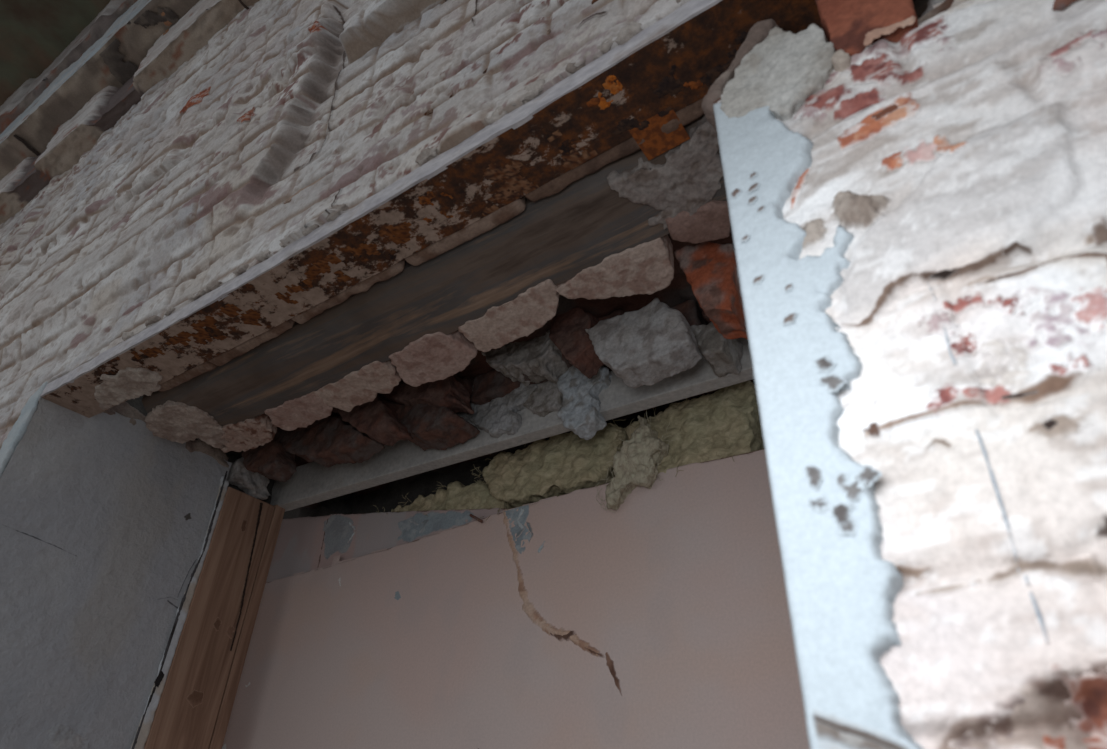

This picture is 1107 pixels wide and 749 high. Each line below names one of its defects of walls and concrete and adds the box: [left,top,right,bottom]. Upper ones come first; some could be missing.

rust [586,75,623,110]
rust [612,31,748,160]
peeling [791,14,958,151]
spalling [880,133,971,173]
rust [275,191,454,305]
rust [131,303,263,365]
spalling [814,355,847,393]
peeling [916,284,1107,418]
spalling [1042,419,1058,431]
spalling [804,464,882,536]
crack [503,509,623,696]
spalling [927,654,1107,749]